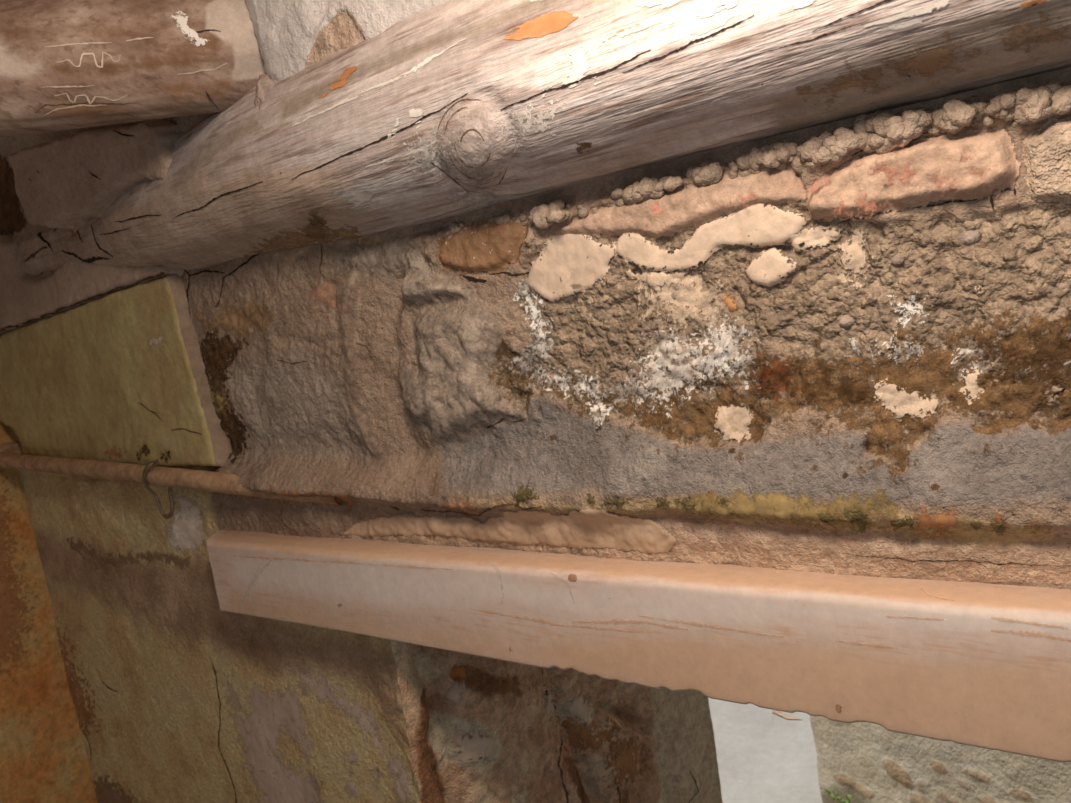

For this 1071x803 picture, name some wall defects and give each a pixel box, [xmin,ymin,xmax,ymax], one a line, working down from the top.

flaking render [786,224,876,289]
peeling [624,267,694,290]
water stain [488,261,1071,488]
water stain [512,485,539,506]
water stain [584,493,628,511]
water stain [656,490,913,533]
water stain [969,520,1006,535]
crack [208,654,237,803]